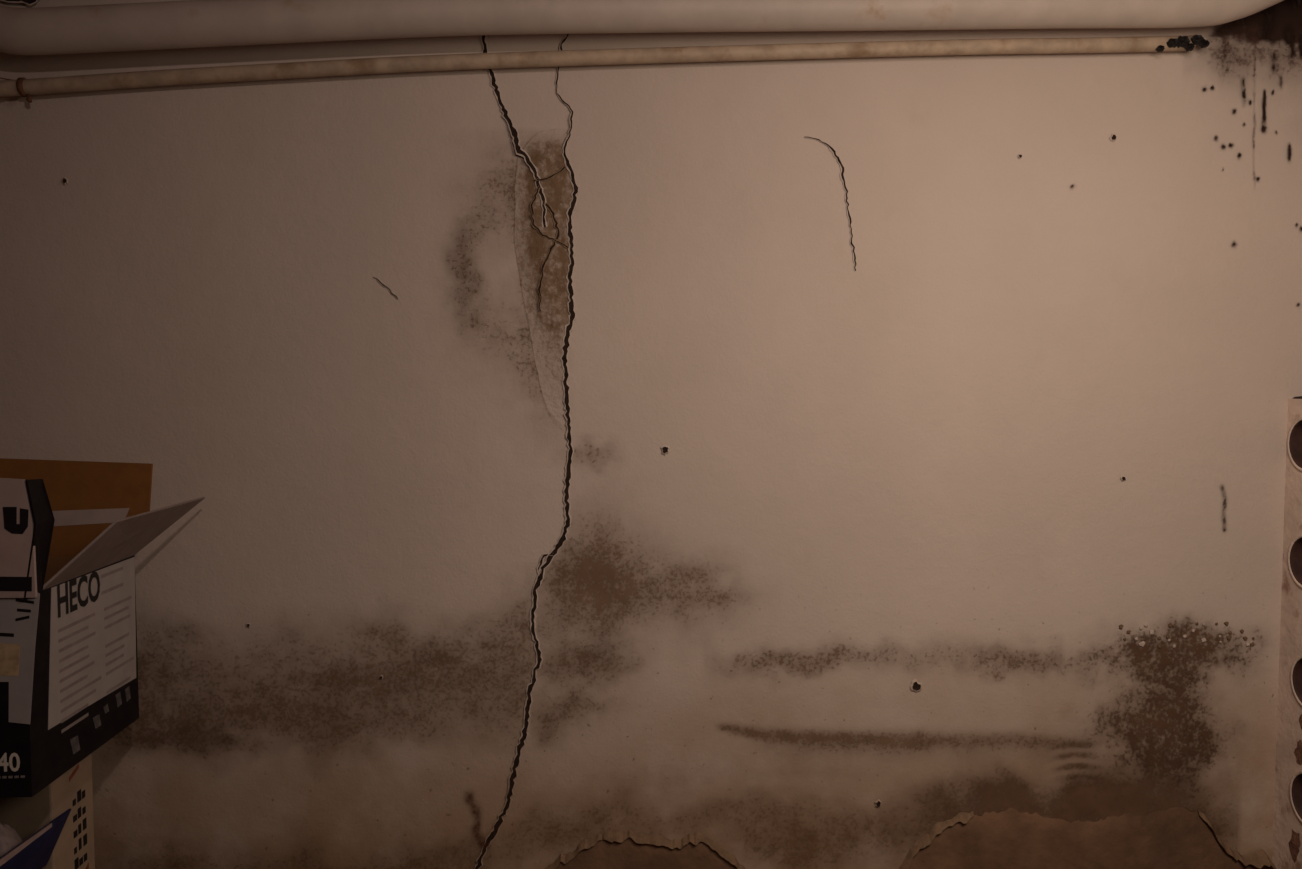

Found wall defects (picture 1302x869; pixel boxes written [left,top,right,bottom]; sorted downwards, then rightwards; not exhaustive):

water stain [1242,6,1302,127]
crack [805,136,857,271]
crack [474,34,579,869]
water stain [113,529,728,754]
water stain [736,646,889,674]
water stain [920,617,1262,836]
peeling [1294,714,1302,765]
flaking render [545,829,745,869]
flaking render [899,807,1276,869]
peeling [1289,829,1301,863]